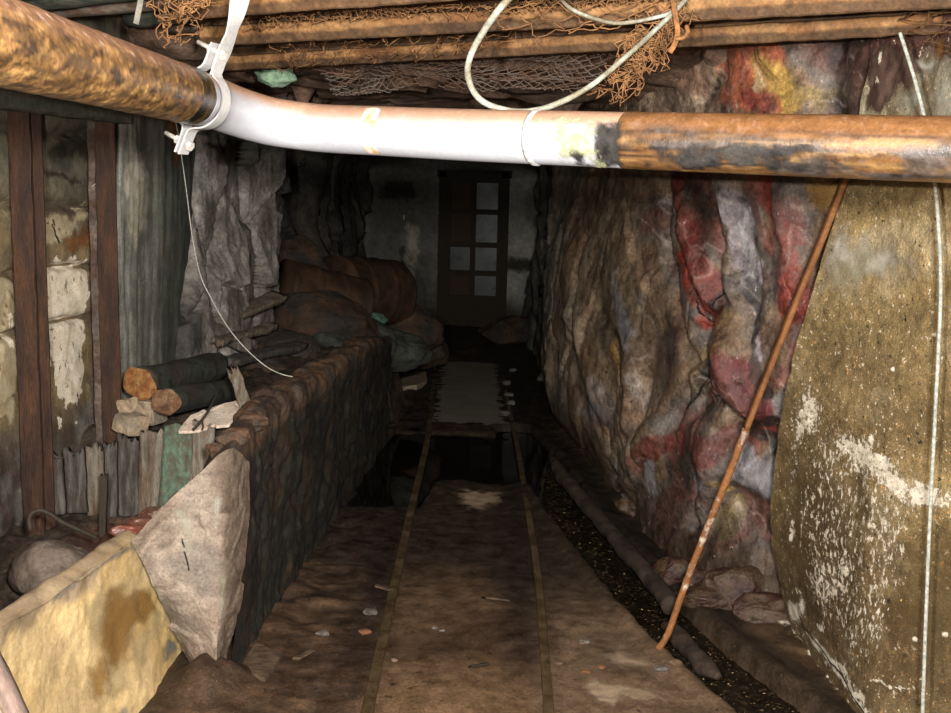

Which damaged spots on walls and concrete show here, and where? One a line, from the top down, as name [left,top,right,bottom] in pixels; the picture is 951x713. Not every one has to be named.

damp [741,459,775,496]
damp [779,385,951,672]
crack [797,618,910,713]